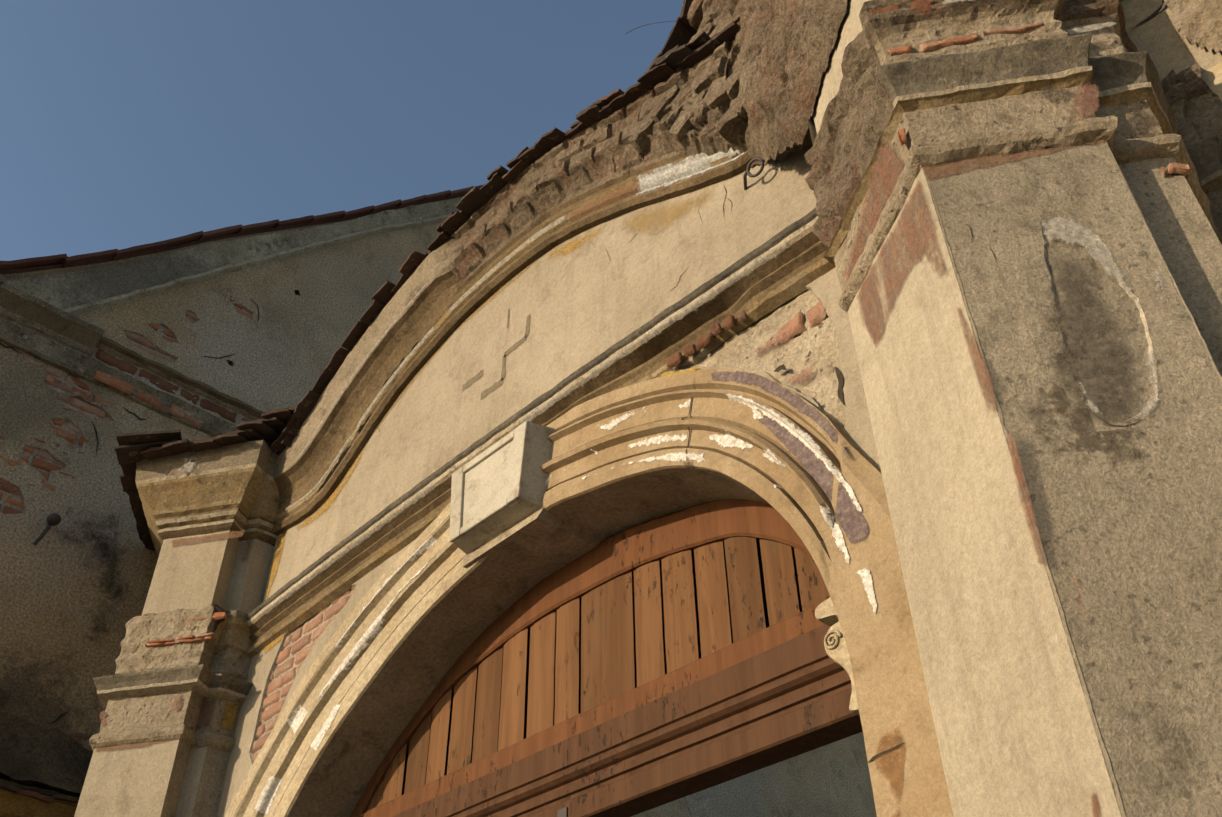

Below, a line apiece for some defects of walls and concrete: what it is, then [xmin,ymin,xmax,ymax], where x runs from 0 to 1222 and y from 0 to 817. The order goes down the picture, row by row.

flaking render [0,349,250,514]
peeling [600,405,646,430]
peeling [519,242,789,424]
peeling [611,434,704,469]
peeling [708,432,785,466]
flaking render [659,286,845,428]
peeling [726,394,862,512]
damp [1048,258,1139,424]
peeling [818,506,877,613]
flaking render [249,584,356,764]
peeling [310,535,438,752]
peeling [254,776,282,817]